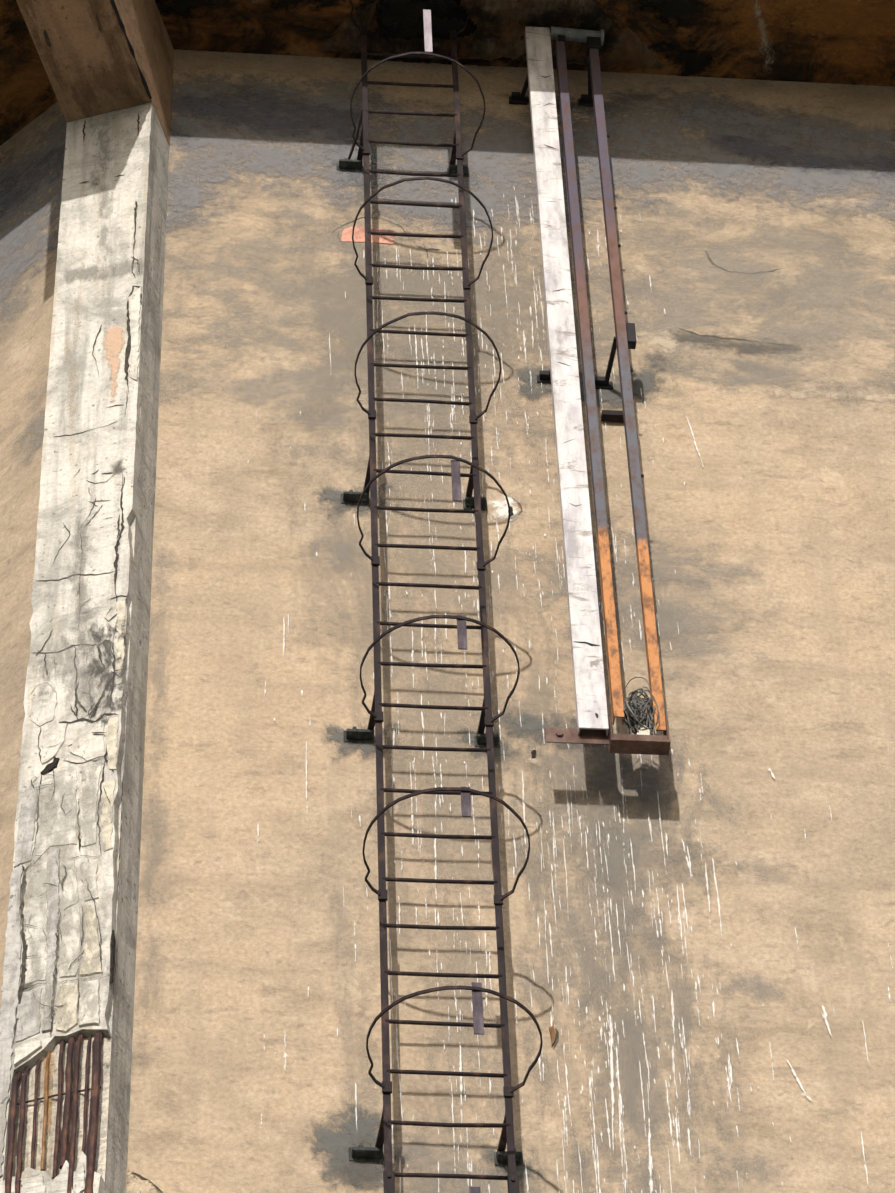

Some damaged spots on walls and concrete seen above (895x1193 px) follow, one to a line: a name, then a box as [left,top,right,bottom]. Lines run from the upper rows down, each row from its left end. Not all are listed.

peeling [92,286,142,408]
flaking render [338,226,395,245]
water stain [558,87,895,446]
water stain [455,551,500,619]
water stain [491,440,567,607]
water stain [596,527,752,674]
crack [13,469,128,1043]
spalling [5,689,119,1193]
water stain [410,591,533,1193]
water stain [462,640,732,1193]
water stain [713,1033,759,1109]
peeling [125,1169,162,1193]